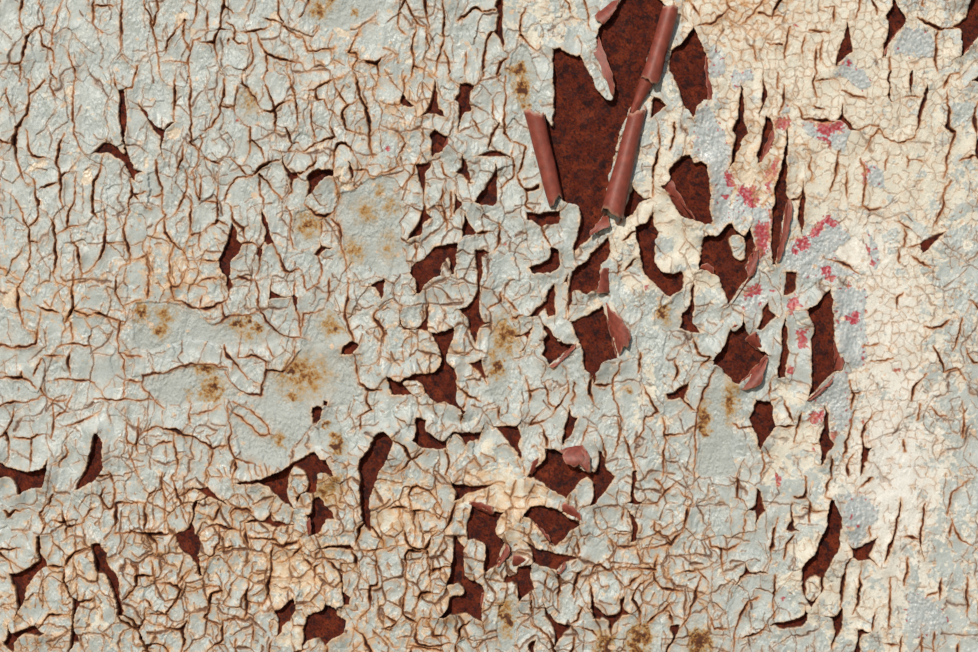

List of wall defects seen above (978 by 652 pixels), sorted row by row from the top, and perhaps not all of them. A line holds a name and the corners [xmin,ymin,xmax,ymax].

crack [0,0,554,652]
peeling [217,299,395,537]
peeling [304,80,513,417]
peeling [409,407,616,652]
peeling [511,0,799,388]
crack [651,116,676,197]
crack [524,332,882,652]
peeling [695,300,792,479]
peeling [806,283,846,468]
crack [688,0,978,269]
crack [839,526,978,652]
crack [902,301,978,452]